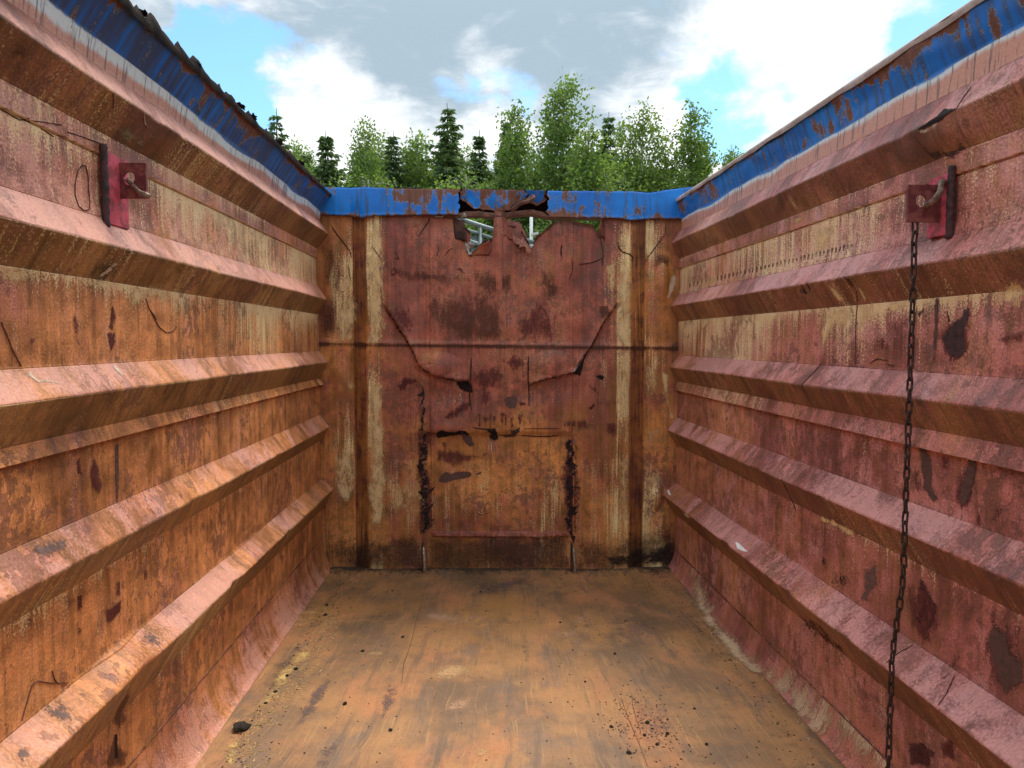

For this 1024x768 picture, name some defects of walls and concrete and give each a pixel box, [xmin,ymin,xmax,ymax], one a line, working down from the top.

rust [107,307,117,350]
rust [939,307,969,366]
rust [445,355,524,428]
rust [76,459,102,493]
rust [438,442,487,467]
crack [384,306,615,543]
rust [911,444,978,508]
rust [107,581,121,622]
rust [906,578,939,645]
rust [978,611,1024,693]
rust [107,693,130,768]
rust [909,740,954,767]